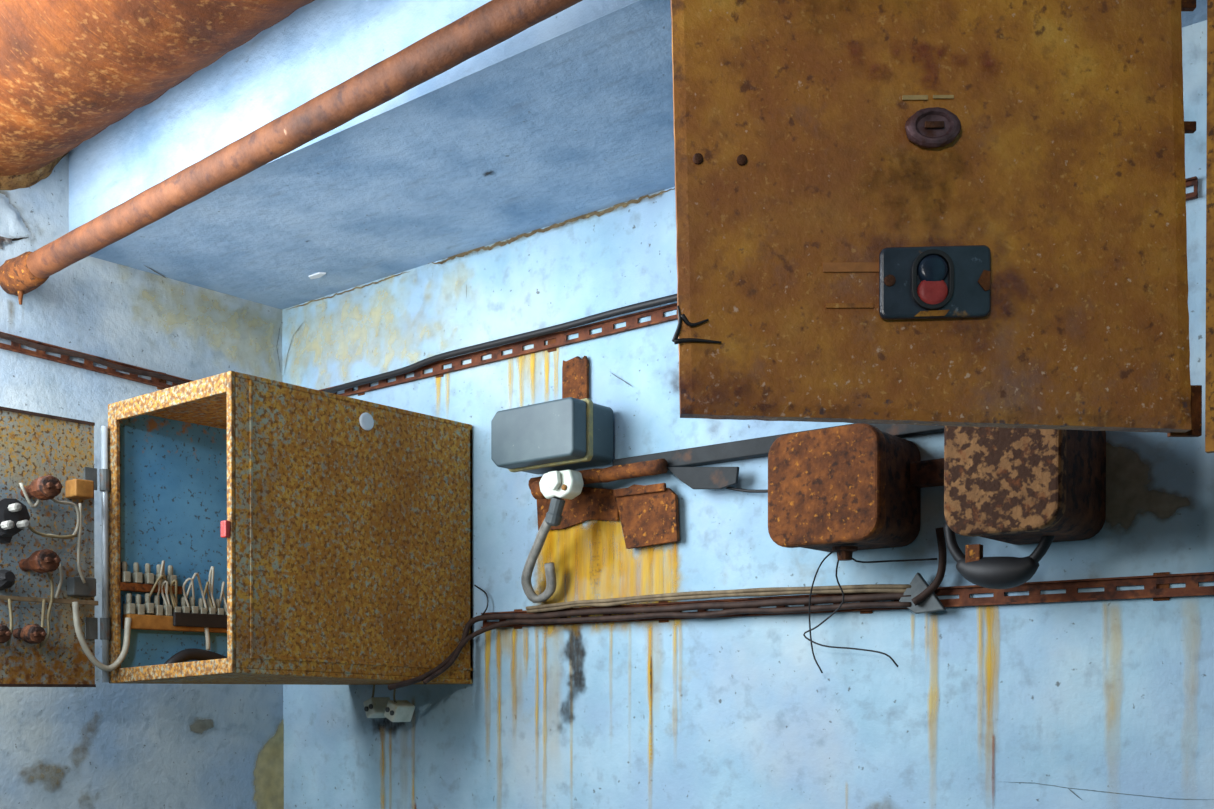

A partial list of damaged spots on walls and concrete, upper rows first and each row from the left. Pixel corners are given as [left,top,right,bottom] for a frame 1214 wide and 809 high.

flaking render [0,192,31,250]
corrosion [485,520,677,724]
corrosion [979,607,993,711]
flaking render [190,719,214,734]
peeling [254,720,284,809]